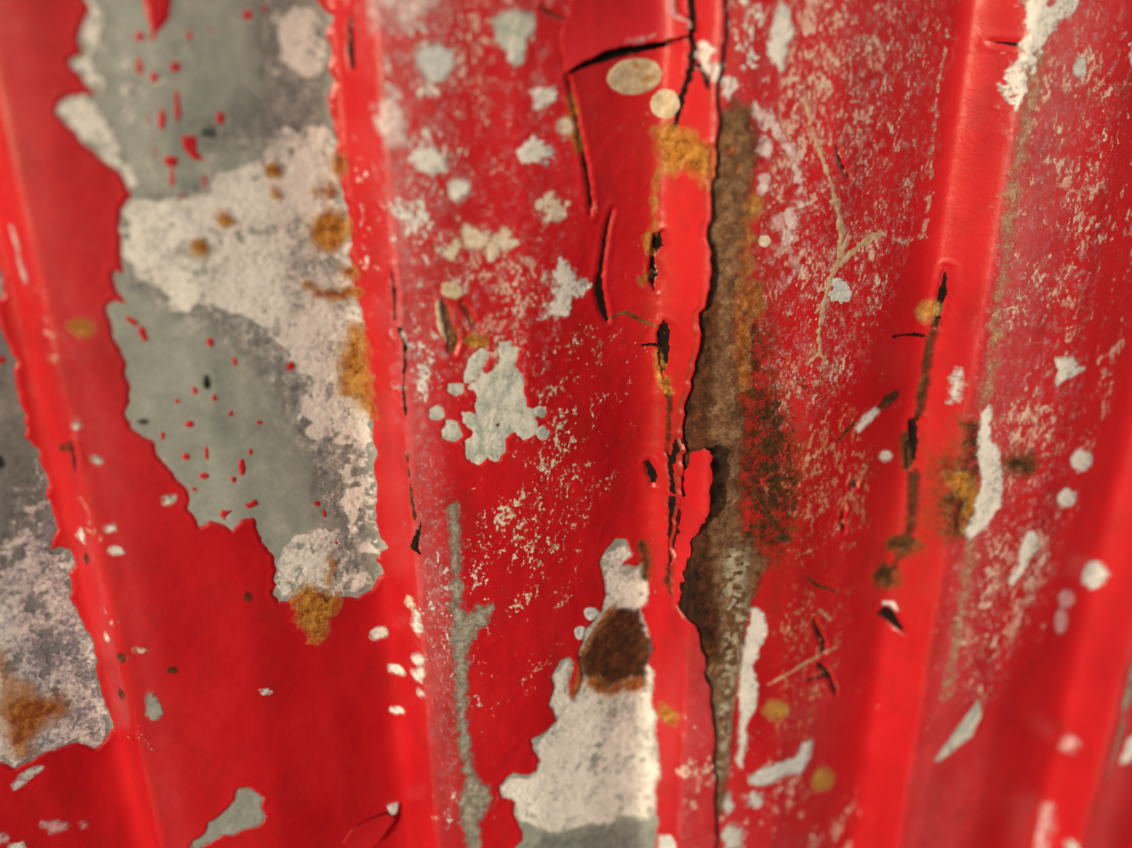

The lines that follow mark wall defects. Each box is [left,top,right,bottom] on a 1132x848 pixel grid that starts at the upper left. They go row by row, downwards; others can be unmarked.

crack [672,0,711,130]
corrosion [0,659,64,757]
peeling [0,328,124,790]
peeling [57,0,388,602]
peeling [347,0,616,717]
peeling [500,538,704,848]
corrosion [570,606,654,697]
crack [567,78,659,328]
crack [645,381,684,596]
corrosion [640,98,815,818]
crack [892,268,948,422]
corrosion [932,421,980,538]